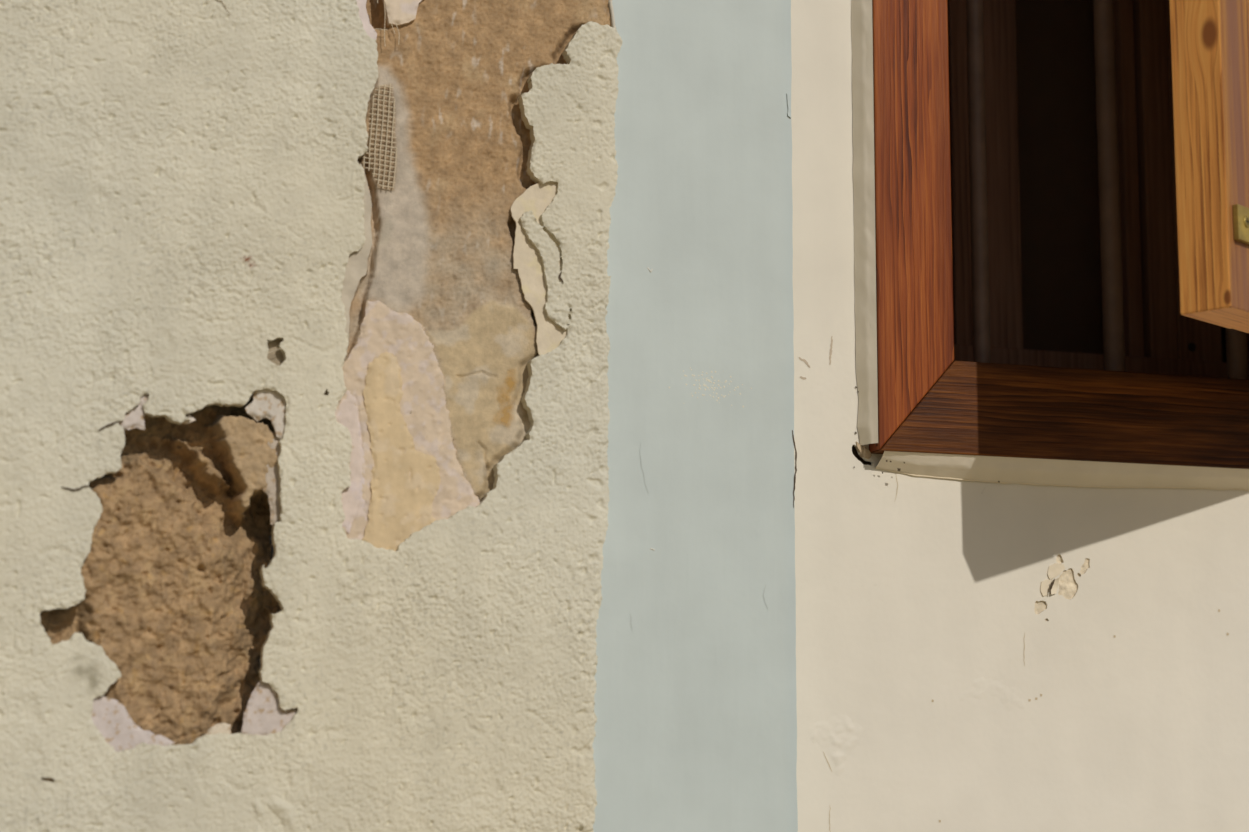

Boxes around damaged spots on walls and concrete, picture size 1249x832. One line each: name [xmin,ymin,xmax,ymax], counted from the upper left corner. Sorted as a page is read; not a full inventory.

peeling [324,0,616,551]
spalling [40,389,297,752]
flaking render [1034,555,1089,621]